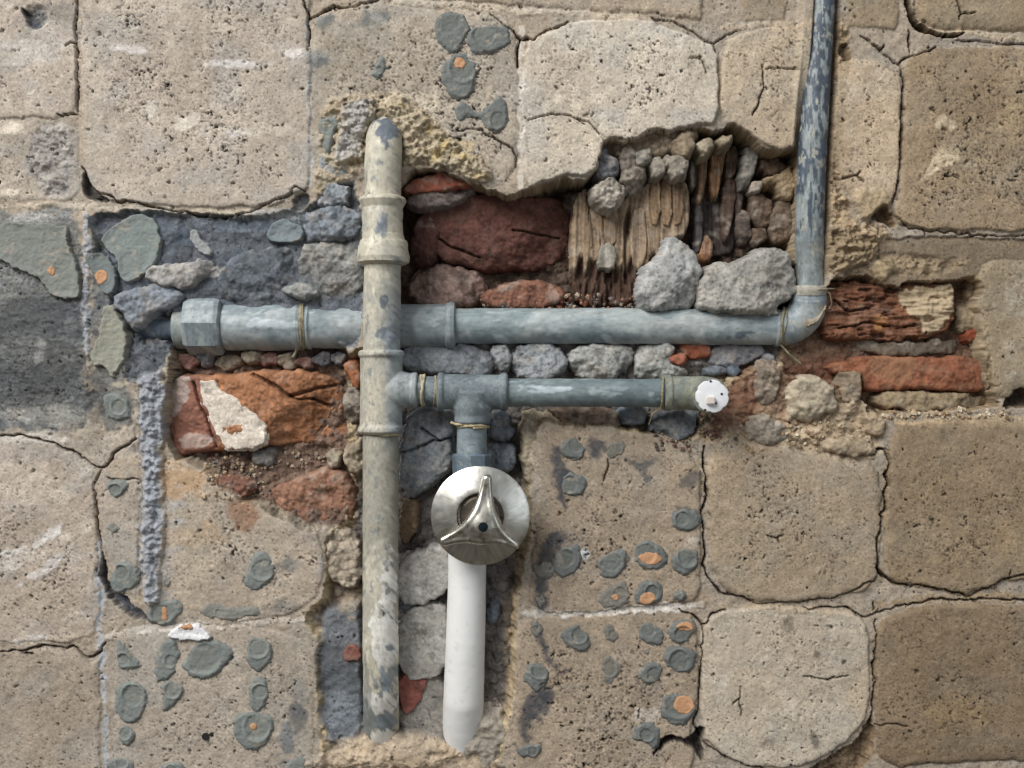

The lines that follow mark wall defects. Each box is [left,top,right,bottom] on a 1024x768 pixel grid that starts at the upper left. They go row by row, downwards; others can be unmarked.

crack [491,14,568,68]
crack [860,32,1018,238]
crack [99,186,306,220]
spalling [599,124,798,270]
spalling [761,319,883,384]
spalling [859,345,1024,415]
crack [0,433,135,552]
spalling [0,169,667,768]
crack [679,445,1024,768]
crack [2,642,106,658]
spalling [653,726,705,760]
spalling [811,715,877,768]